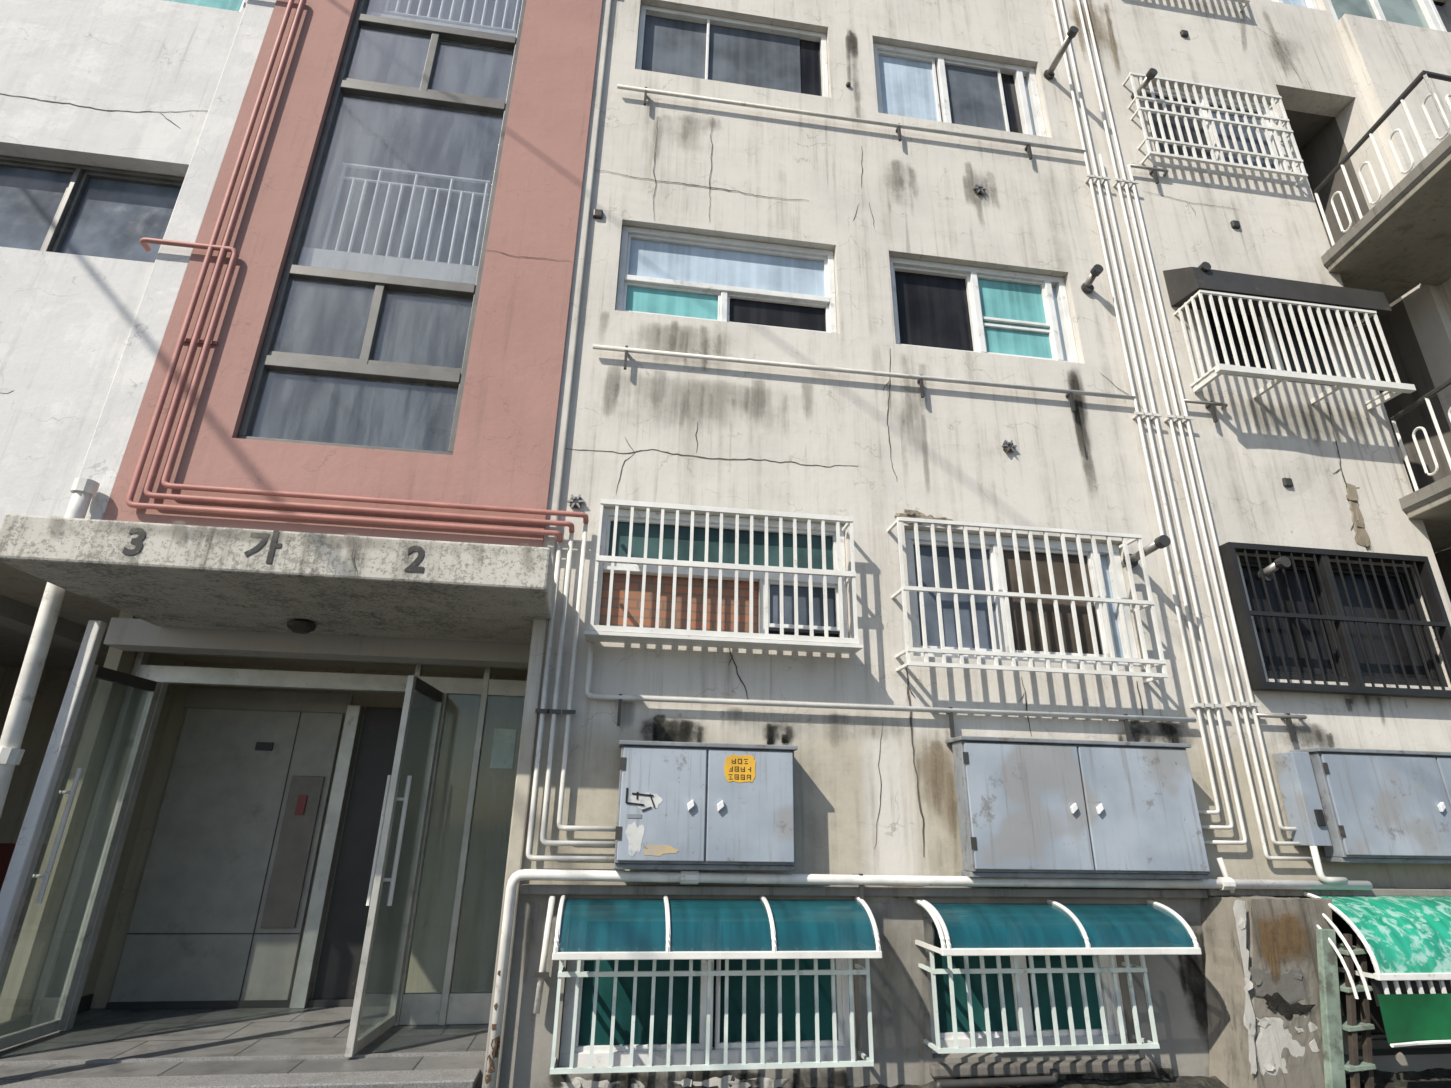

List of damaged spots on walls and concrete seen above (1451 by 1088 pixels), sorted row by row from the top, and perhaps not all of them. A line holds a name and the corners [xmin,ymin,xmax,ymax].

crack [0,93,208,129]
crack [566,422,852,492]
crack [883,355,897,479]
damp [1070,373,1093,471]
crack [1327,402,1367,548]
crack [874,668,925,857]
peeling [1233,899,1320,1075]
corrosion [1259,914,1308,980]